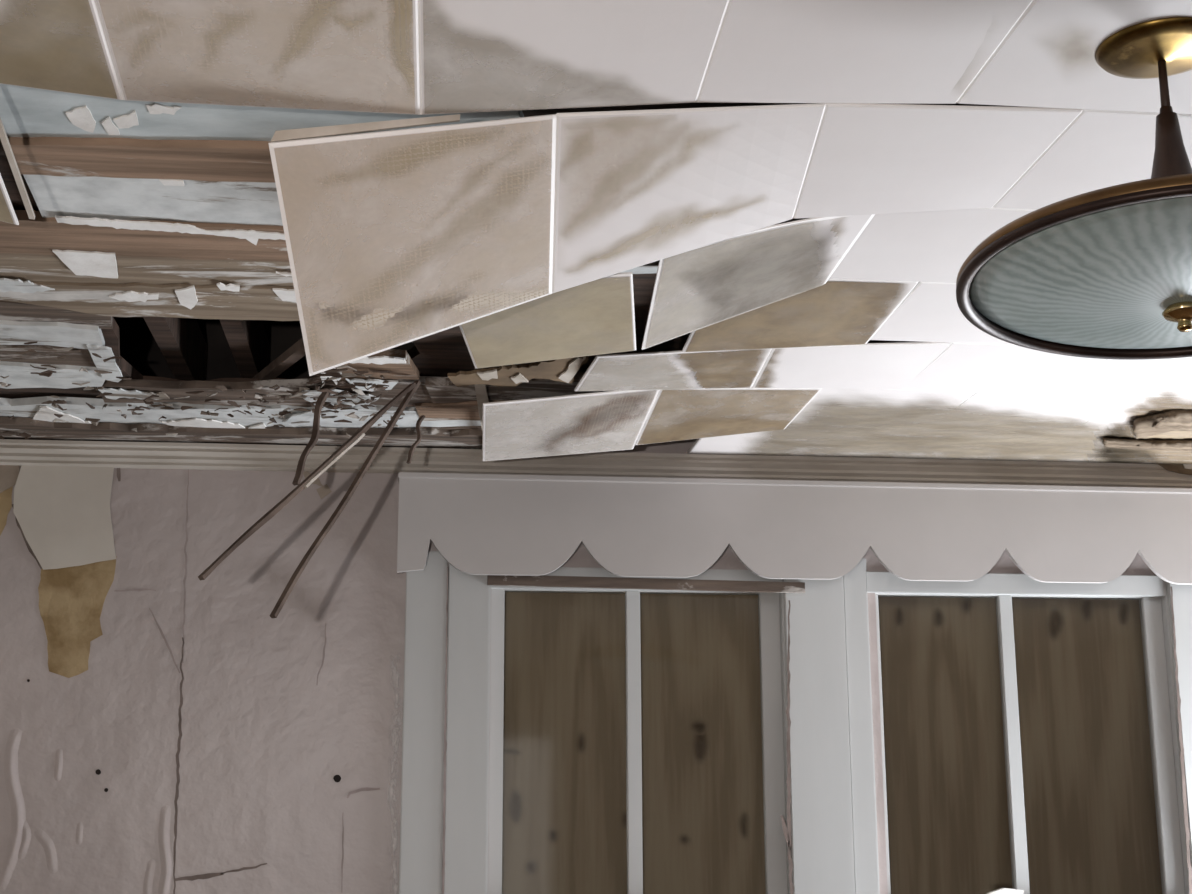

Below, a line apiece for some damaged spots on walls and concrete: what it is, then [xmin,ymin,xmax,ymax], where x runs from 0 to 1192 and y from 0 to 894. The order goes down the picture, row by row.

water stain [0,0,237,101]
water stain [387,0,574,131]
water stain [370,128,483,195]
water stain [0,188,14,224]
spalling [52,250,118,279]
peeling [55,215,285,245]
water stain [443,149,1192,464]
spalling [87,344,170,400]
peeling [282,356,406,427]
spalling [448,356,589,387]
flaking render [38,559,116,678]
crack [114,469,267,894]